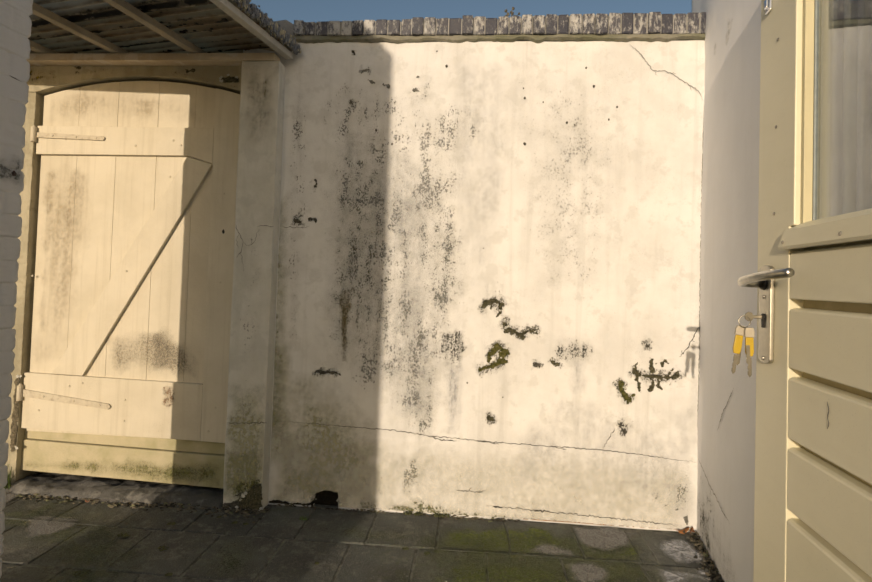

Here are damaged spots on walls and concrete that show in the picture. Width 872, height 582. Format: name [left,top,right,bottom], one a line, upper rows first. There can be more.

crack [632,46,704,198]
damp [330,99,465,431]
crack [289,283,734,520]
damp [555,340,592,360]
spalling [222,484,342,510]
crack [457,488,678,526]